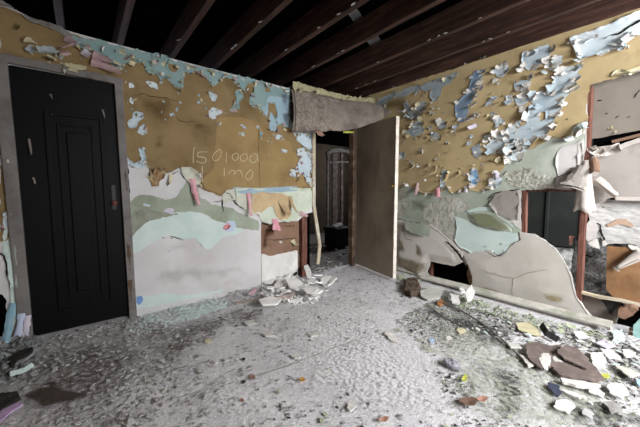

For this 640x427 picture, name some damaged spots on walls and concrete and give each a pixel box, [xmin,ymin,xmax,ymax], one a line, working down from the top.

peeling [0,0,640,255]
spalling [428,262,469,285]